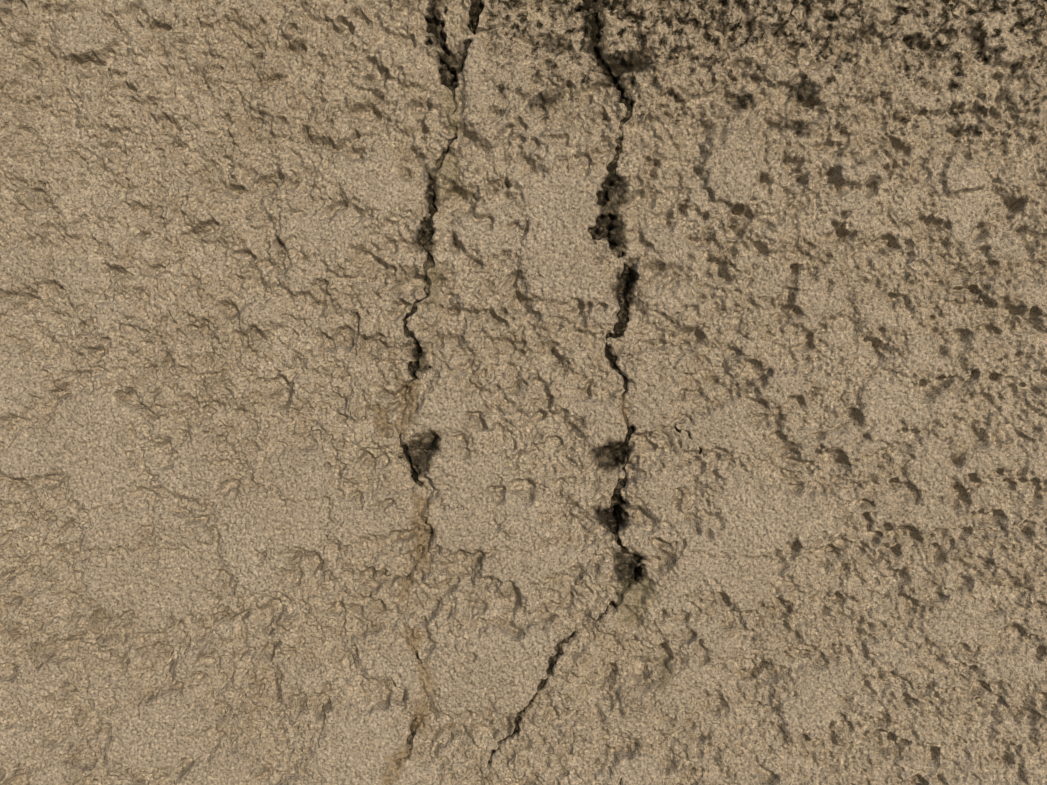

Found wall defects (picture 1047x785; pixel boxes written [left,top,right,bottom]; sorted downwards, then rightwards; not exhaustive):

crack [402,0,484,394]
crack [483,0,637,780]
crack [398,433,423,487]
crack [407,523,433,585]
crack [396,715,421,765]